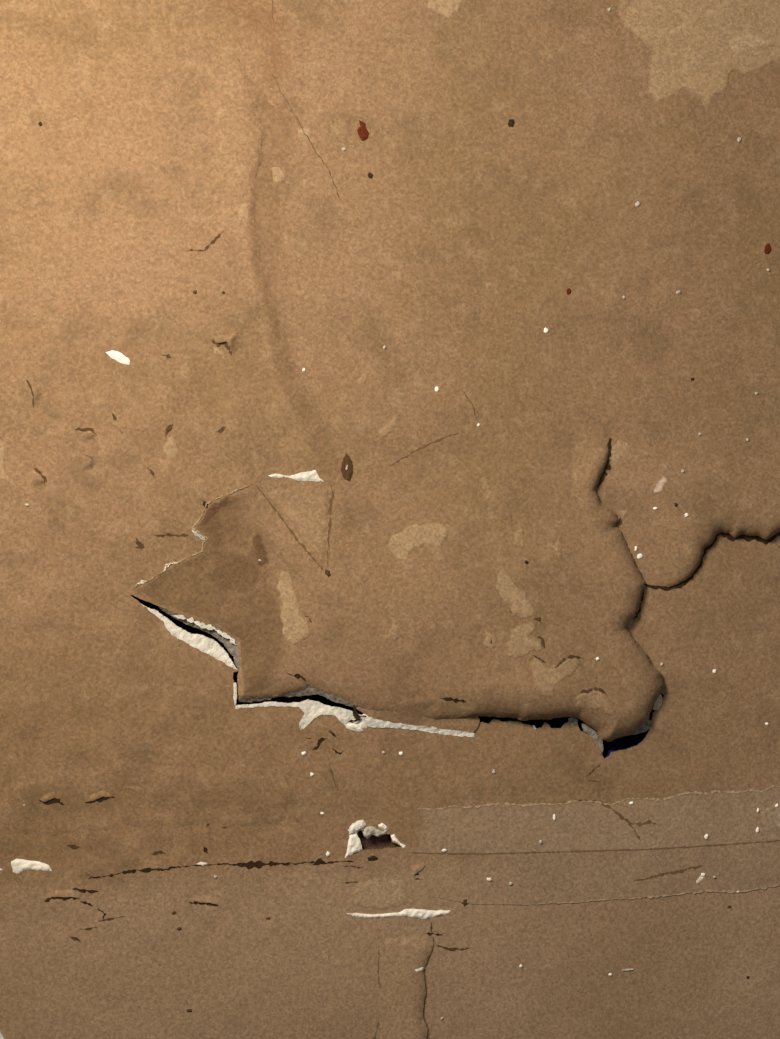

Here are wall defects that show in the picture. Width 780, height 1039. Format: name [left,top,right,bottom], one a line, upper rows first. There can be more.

peeling [618,0,780,113]
peeling [611,439,630,466]
peeling [386,522,448,561]
peeling [276,571,311,646]
peeling [495,569,581,698]
peeling [575,687,616,716]
flaking render [378,823,405,849]
peeling [346,909,450,919]